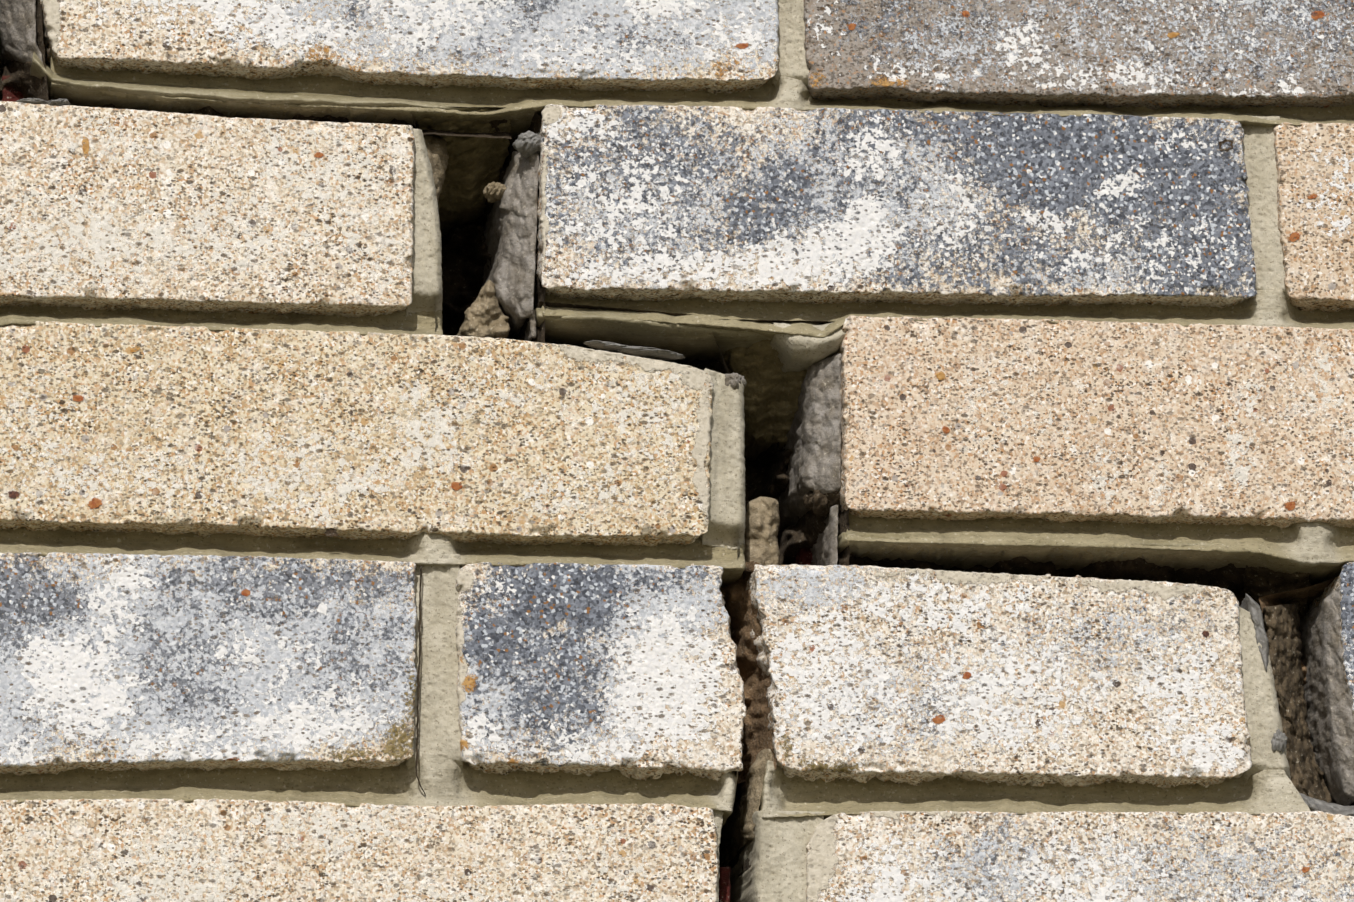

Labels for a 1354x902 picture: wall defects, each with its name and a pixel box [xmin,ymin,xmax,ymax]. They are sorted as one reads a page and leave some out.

crack [0,0,57,101]
crack [102,103,137,111]
crack [183,106,229,118]
crack [291,106,691,343]
crack [677,319,834,374]
crack [720,442,1335,784]
crack [721,826,751,877]